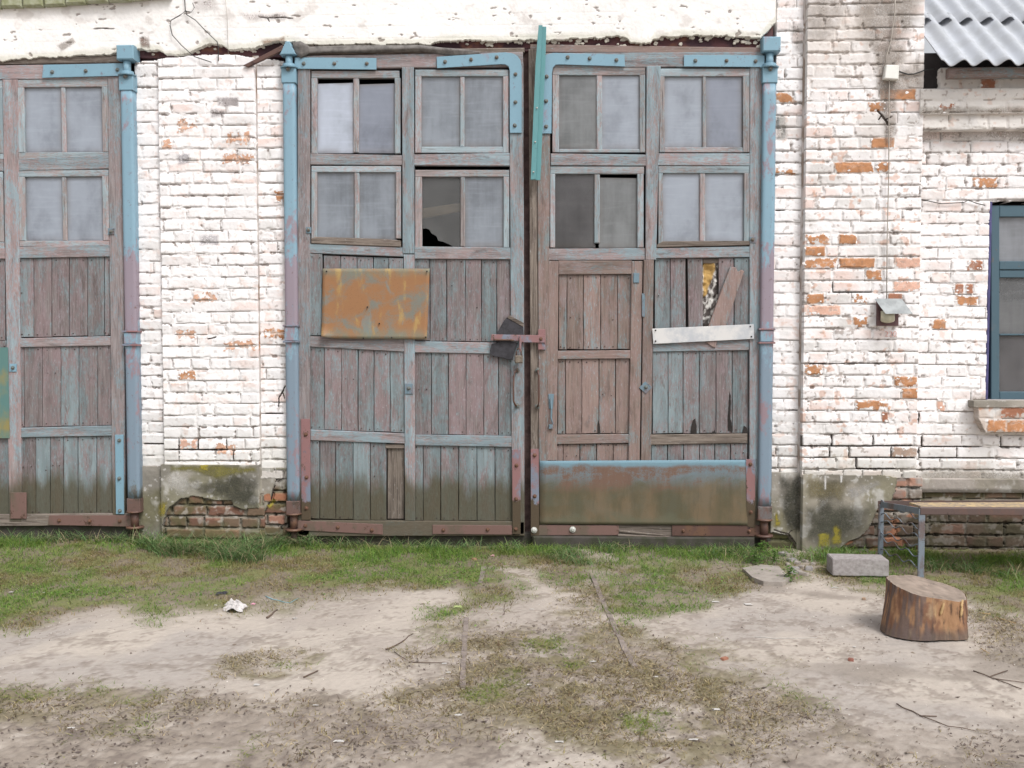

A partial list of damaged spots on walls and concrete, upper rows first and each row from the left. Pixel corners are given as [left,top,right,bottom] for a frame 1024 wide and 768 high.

peeling [868,88,916,114]
peeling [222,130,258,165]
peeling [834,137,895,173]
peeling [802,233,923,299]
peeling [966,259,983,271]
peeling [806,293,868,329]
peeling [952,283,979,306]
peeling [223,327,285,351]
peeling [985,408,1024,433]
spalling [161,470,290,544]
water stain [206,477,256,505]
spalling [841,474,922,552]